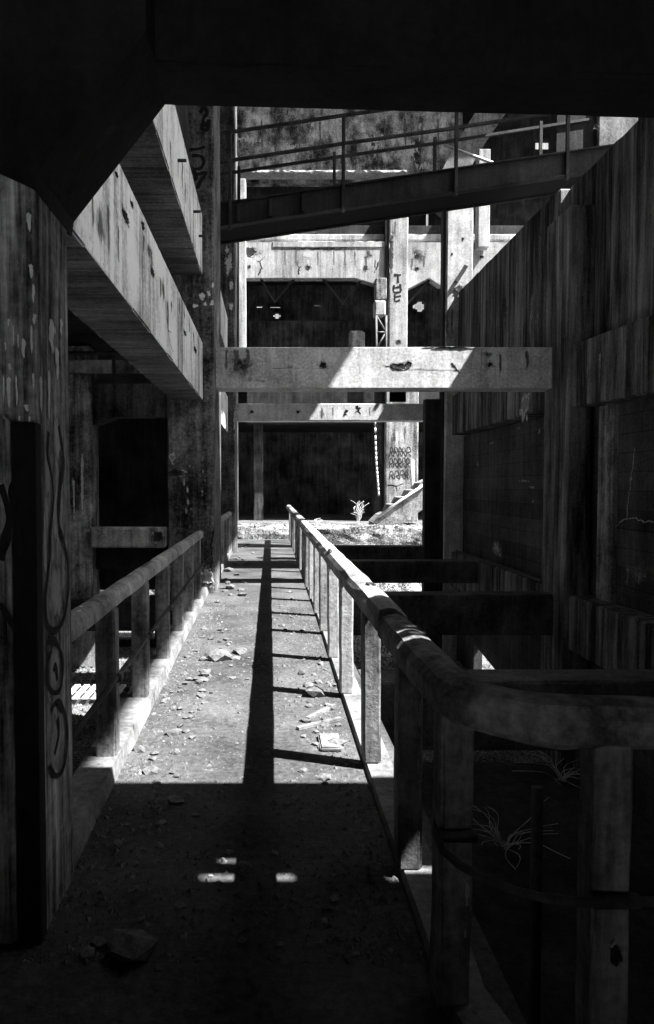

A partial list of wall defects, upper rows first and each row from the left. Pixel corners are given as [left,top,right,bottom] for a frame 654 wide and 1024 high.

leakage [92,198,119,259]
peeling [4,264,37,358]
leakage [160,279,194,336]
peeling [3,319,63,422]
spalling [386,360,412,370]
crack [616,448,653,526]